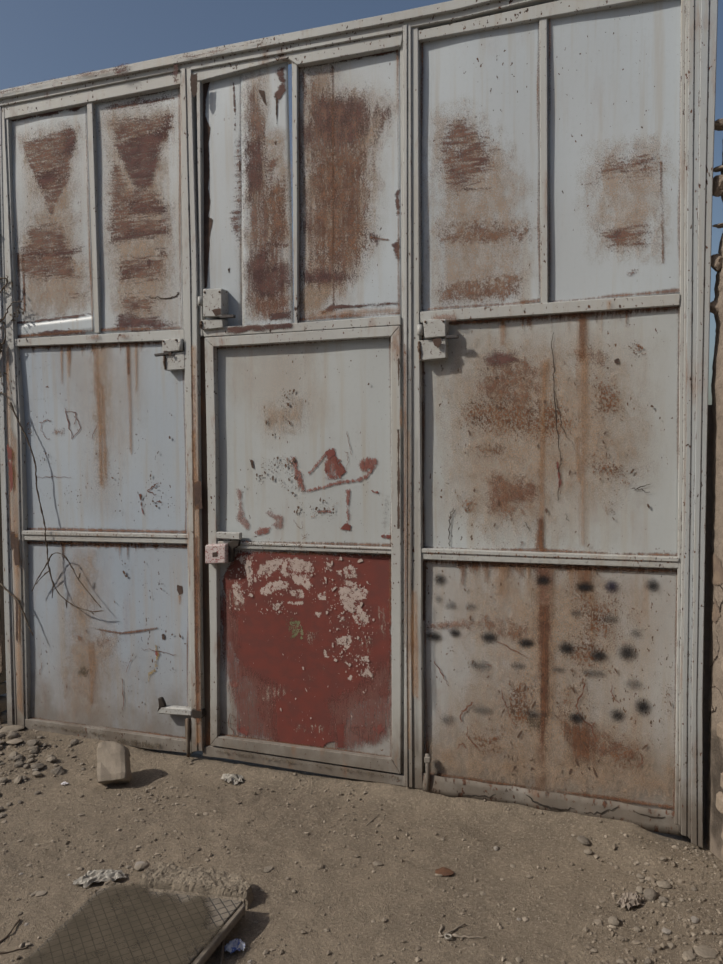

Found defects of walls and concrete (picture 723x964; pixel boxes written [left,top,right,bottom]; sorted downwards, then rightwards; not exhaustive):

corrosion [12,87,181,435]
corrosion [227,49,400,334]
corrosion [537,18,551,118]
corrosion [14,370,202,725]
peeling [223,552,386,685]
corrosion [220,535,391,628]
corrosion [422,118,679,809]